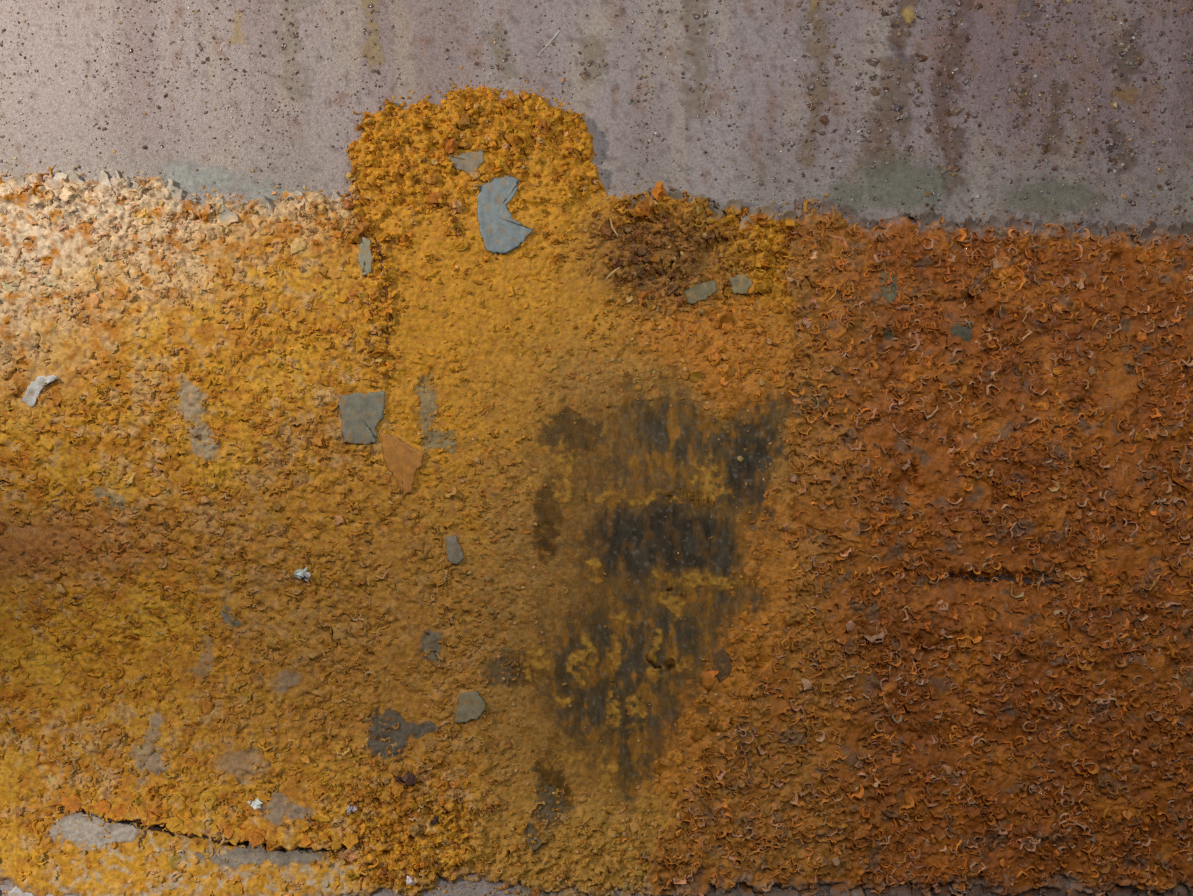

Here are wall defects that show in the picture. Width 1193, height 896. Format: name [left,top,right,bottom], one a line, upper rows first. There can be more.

corrosion [790,0,850,160]
peeling [448,149,484,174]
corrosion [1089,119,1140,170]
peeling [477,175,533,254]
peeling [338,391,385,445]
peeling [415,376,455,453]
peeling [445,535,464,564]
peeling [454,368,791,855]
peeling [421,631,441,661]
peeling [367,707,440,759]